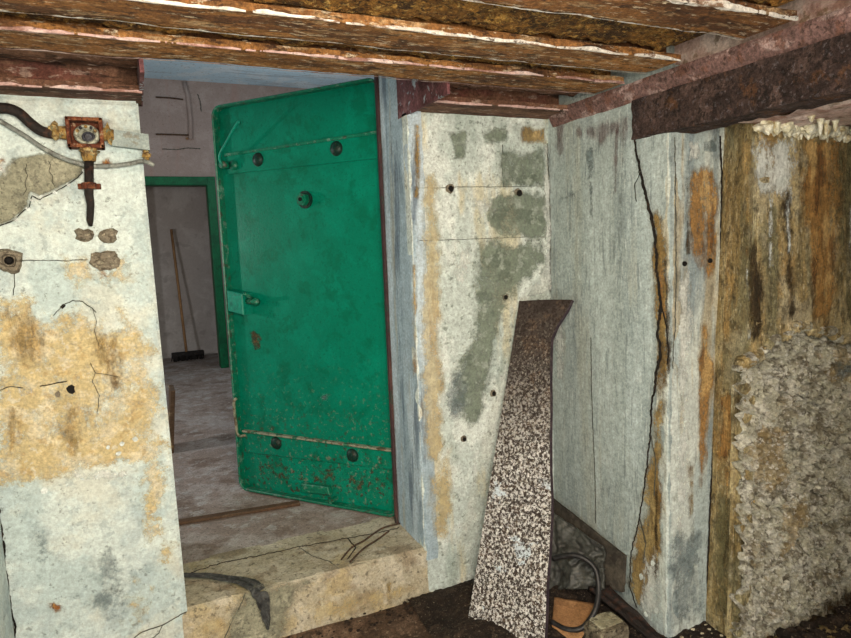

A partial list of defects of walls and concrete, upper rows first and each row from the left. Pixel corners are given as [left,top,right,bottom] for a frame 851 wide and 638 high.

flaking render [0,154,84,226]
crack [53,300,99,345]
water stain [0,296,171,538]
crack [191,527,399,573]
water stain [432,467,450,534]
water stain [413,125,552,460]
rust [630,212,672,605]
crack [629,137,677,608]
rust [686,168,719,277]
rust [688,325,731,514]
spalling [691,321,851,638]
water stain [752,120,851,324]